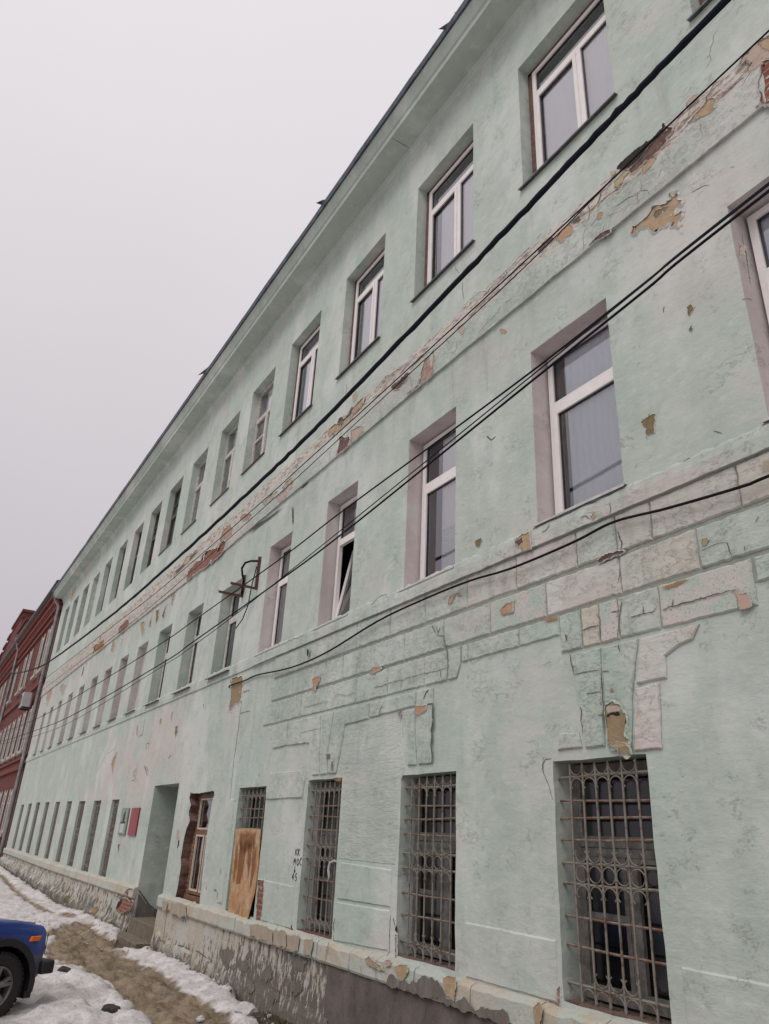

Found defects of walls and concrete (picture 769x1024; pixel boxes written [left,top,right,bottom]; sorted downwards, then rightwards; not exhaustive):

peeling [738,35,769,108]
peeling [630,189,685,237]
flaking render [391,349,436,394]
flaking render [325,391,366,455]
peeling [640,413,656,439]
flaking render [183,512,253,581]
peeling [515,529,532,552]
flaking render [597,549,626,565]
crack [565,503,731,734]
peeling [229,674,245,711]
peeling [599,688,635,761]
peeling [365,926,509,1024]